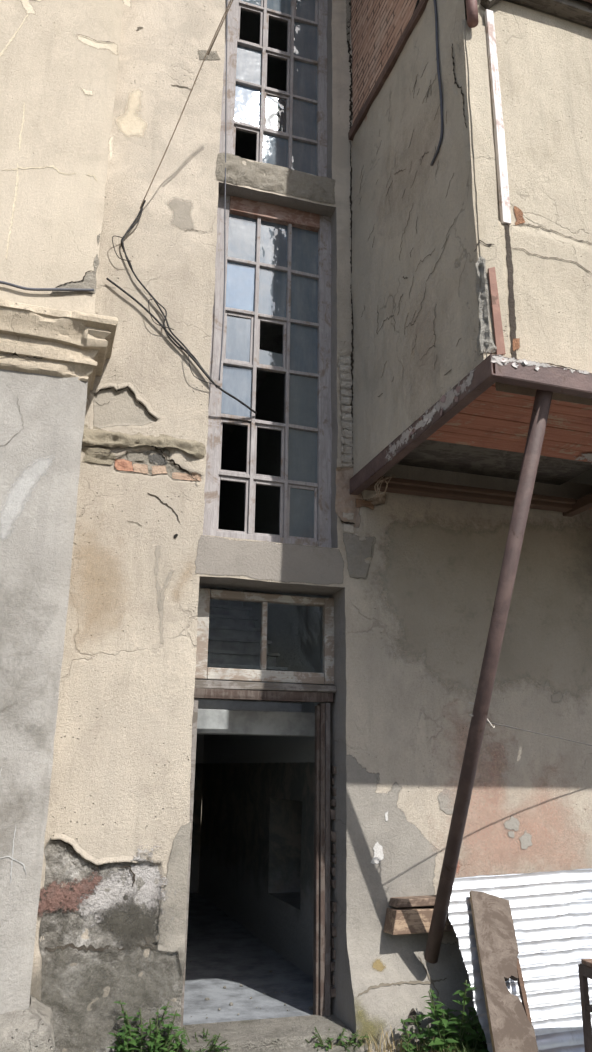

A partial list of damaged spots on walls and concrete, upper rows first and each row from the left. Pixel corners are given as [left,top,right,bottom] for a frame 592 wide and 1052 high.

flaking render [78,34,118,55]
crack [359,44,467,369]
flaking render [474,240,590,374]
peeling [90,382,161,428]
peeling [385,369,476,461]
flaking render [95,442,201,482]
crack [148,493,180,522]
flaking render [335,467,386,580]
flaking render [371,841,384,864]
flaking render [37,833,185,1052]
crack [358,957,447,1000]